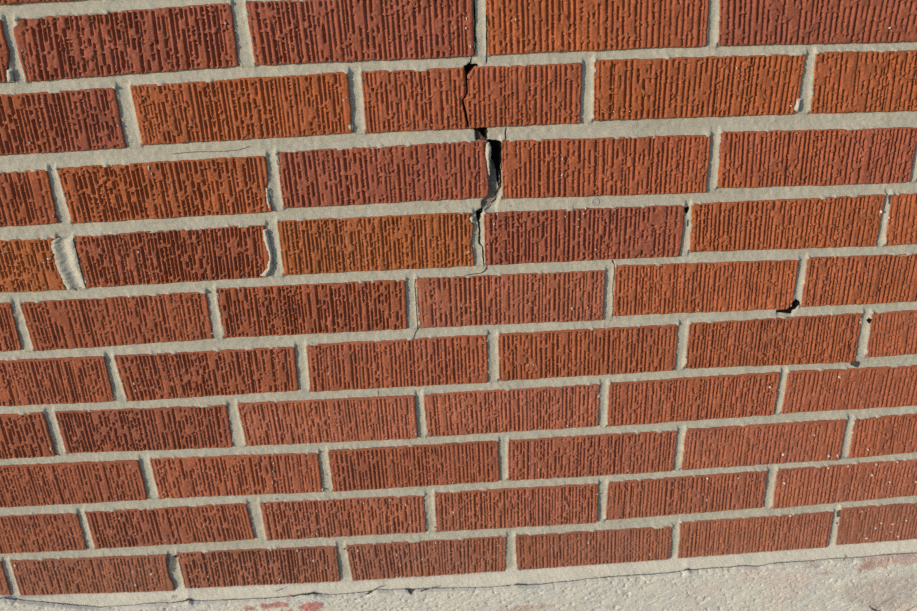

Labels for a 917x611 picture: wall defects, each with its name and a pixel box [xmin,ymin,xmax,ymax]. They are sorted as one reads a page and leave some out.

crack [462,0,506,276]